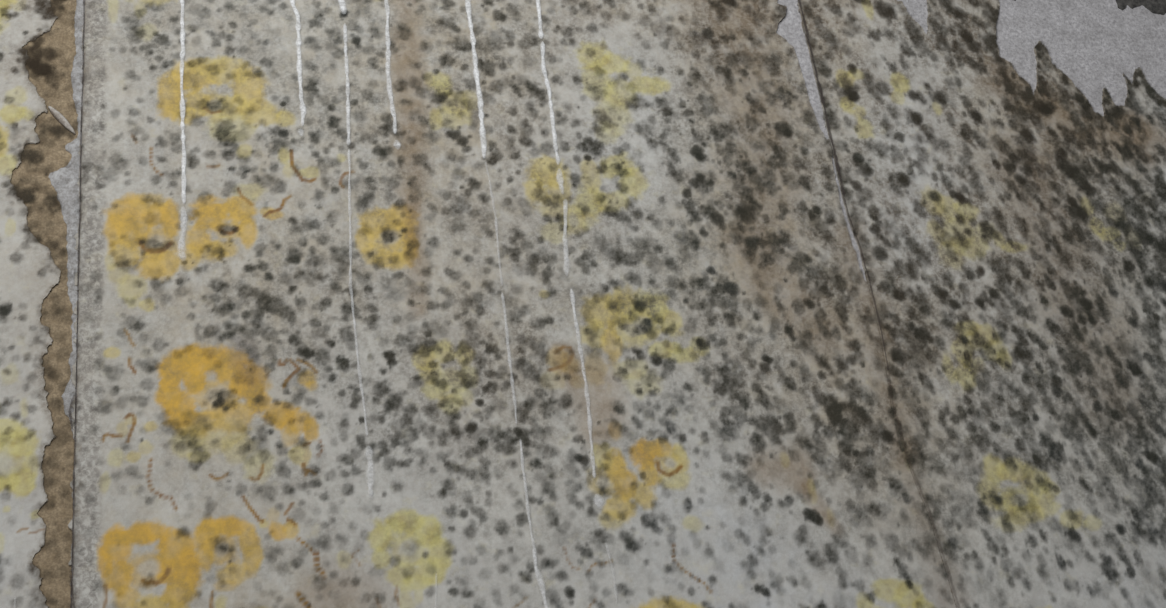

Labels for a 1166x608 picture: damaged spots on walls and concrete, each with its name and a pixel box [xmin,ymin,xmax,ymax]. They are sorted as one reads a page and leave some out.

damp [5,179,58,211]
damp [13,31,57,86]
peeling [10,0,85,608]
damp [36,0,64,19]
damp [149,0,195,257]
damp [206,242,371,381]
damp [273,0,323,161]
damp [342,331,573,608]
damp [440,0,625,266]
damp [571,289,606,514]
damp [628,97,810,265]
damp [679,0,1166,580]